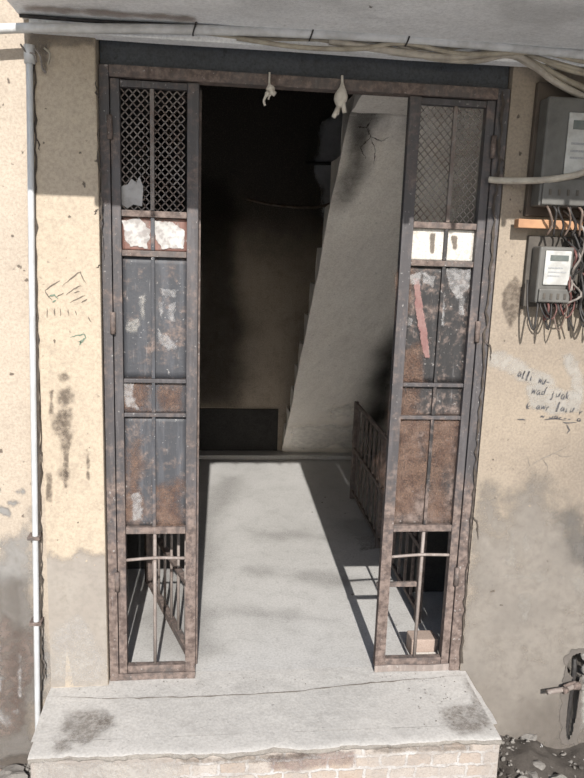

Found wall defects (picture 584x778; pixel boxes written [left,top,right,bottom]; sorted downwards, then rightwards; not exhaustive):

leakage [0,755,28,766]
leakage [0,618,34,736]
peeling [0,515,108,761]
peeling [461,481,584,749]